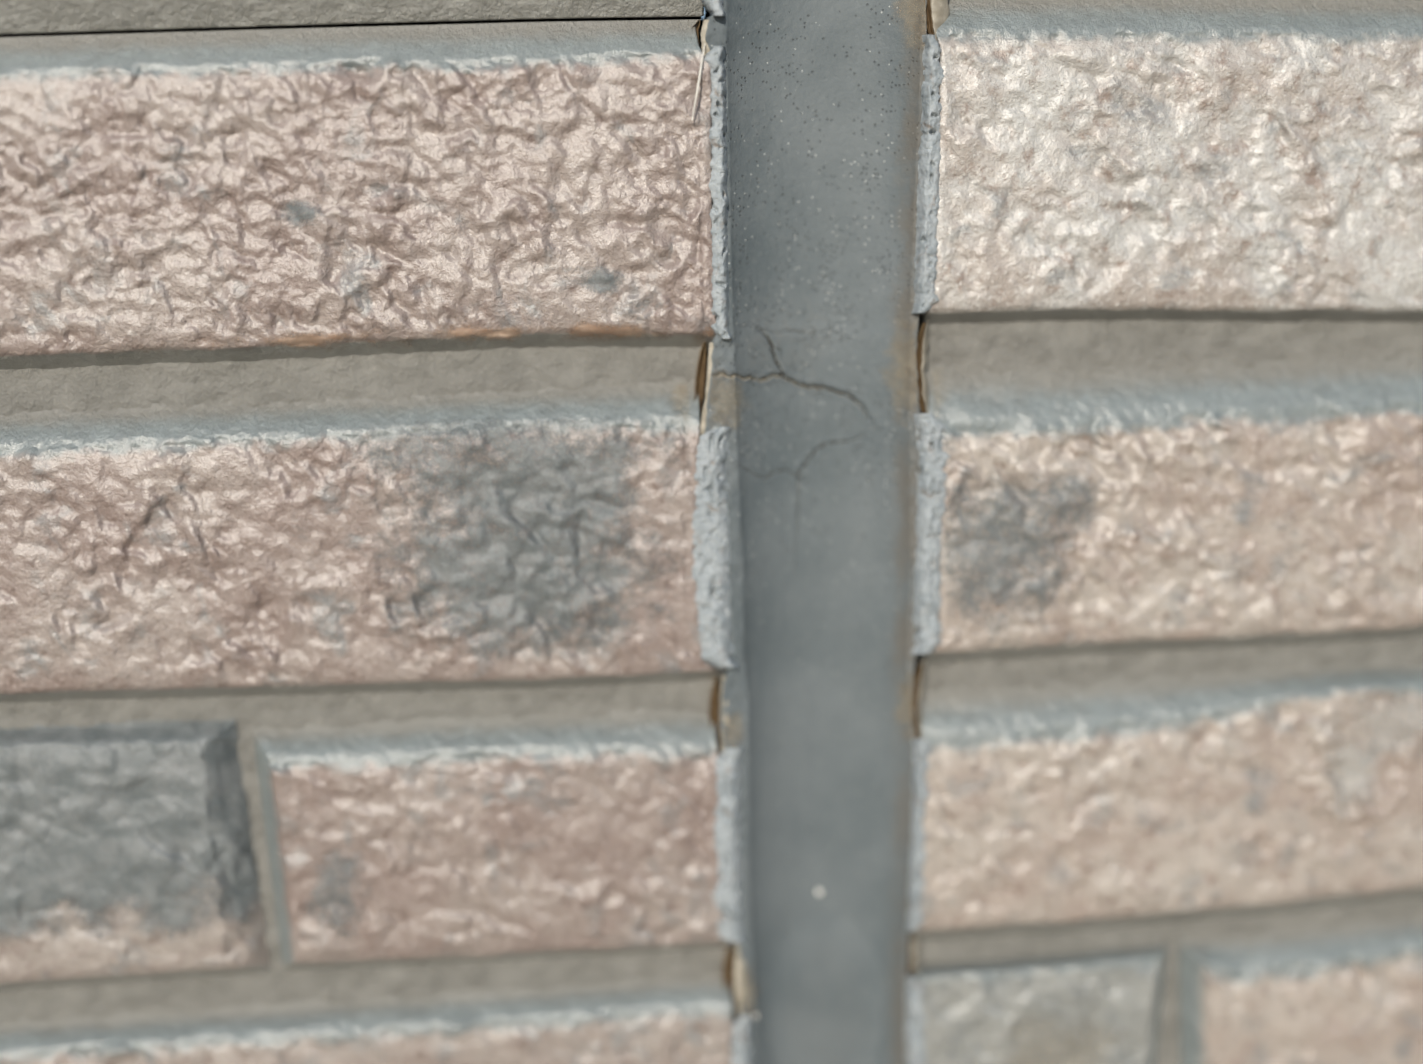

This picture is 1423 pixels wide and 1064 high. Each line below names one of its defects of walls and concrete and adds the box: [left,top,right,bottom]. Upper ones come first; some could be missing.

peeling [924,0,950,40]
peeling [694,342,714,436]
peeling [916,320,929,413]
crack [712,329,867,572]
peeling [709,675,730,754]